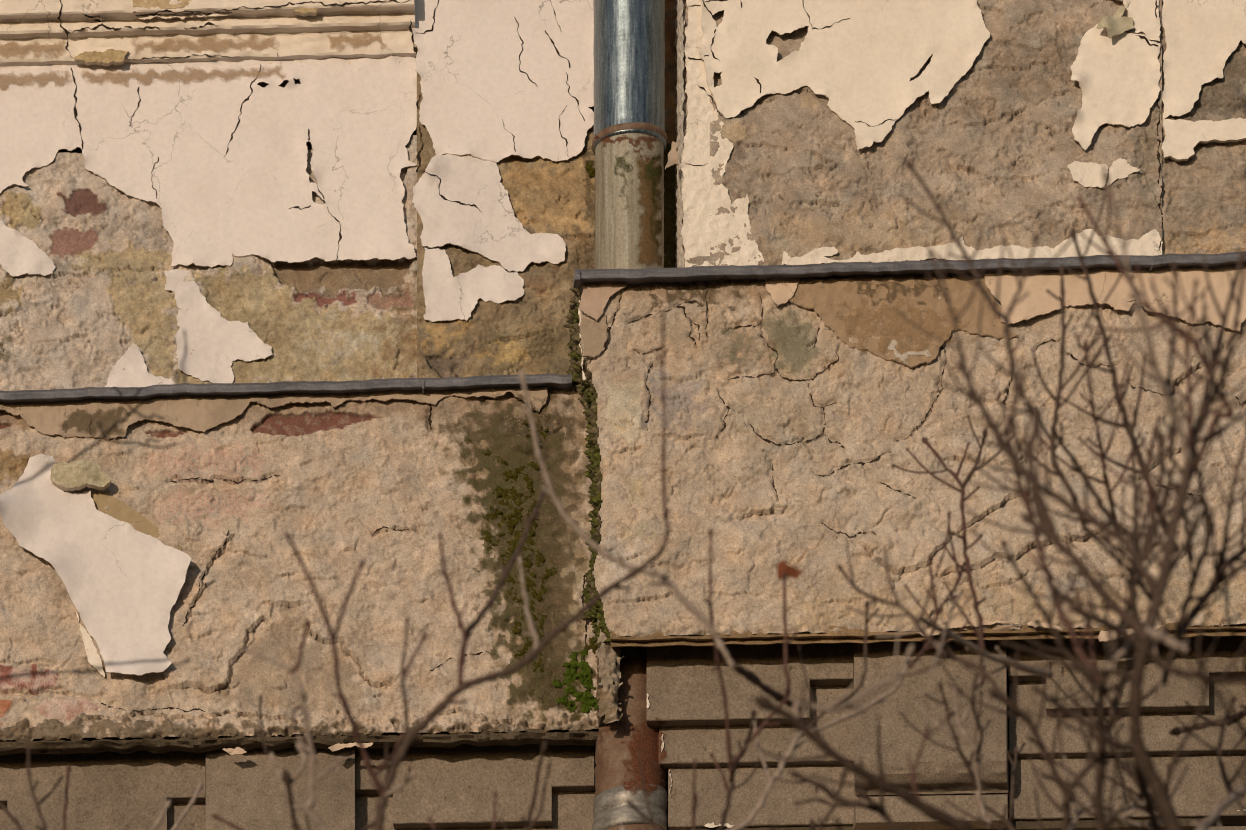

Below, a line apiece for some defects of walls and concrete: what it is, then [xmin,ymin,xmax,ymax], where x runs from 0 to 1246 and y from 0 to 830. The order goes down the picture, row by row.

flaking render [74,49,129,66]
crack [57,0,439,153]
flaking render [0,73,627,391]
crack [289,186,342,262]
crack [416,95,479,209]
rust [594,134,658,159]
flaking render [663,0,1246,368]
flaking render [252,411,384,437]
crack [589,282,947,500]
peeling [0,453,192,678]
leakage [439,394,585,717]
rust [621,719,668,795]